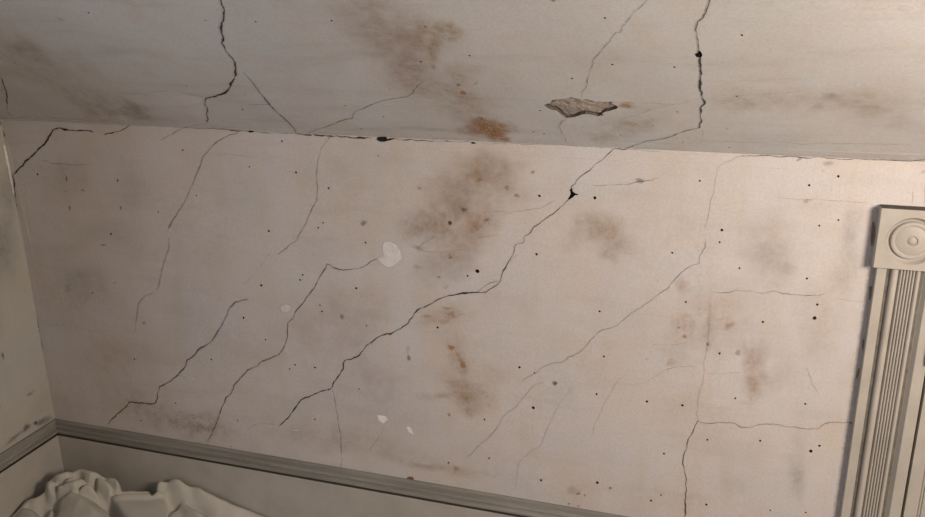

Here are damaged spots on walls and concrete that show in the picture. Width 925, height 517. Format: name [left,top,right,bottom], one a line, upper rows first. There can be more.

crack [195,0,422,139]
spalling [545,97,618,118]
crack [280,0,710,425]
crack [109,300,242,423]
crack [208,259,377,440]
crack [682,421,753,517]